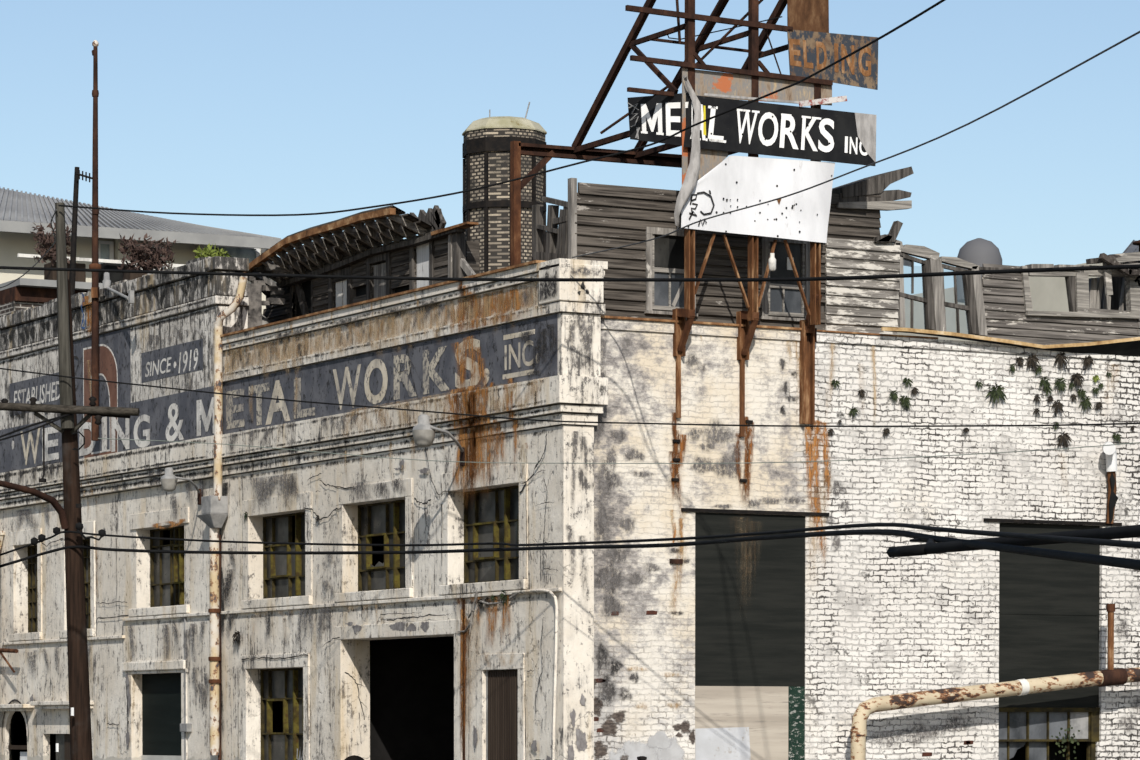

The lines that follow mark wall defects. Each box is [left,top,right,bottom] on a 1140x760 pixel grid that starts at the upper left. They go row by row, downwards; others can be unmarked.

corrosion [225,263,541,487]
corrosion [669,412,686,498]
corrosion [736,416,754,497]
corrosion [805,420,830,548]
peeling [389,621,429,632]
peeling [567,678,628,760]
peeling [673,721,696,744]